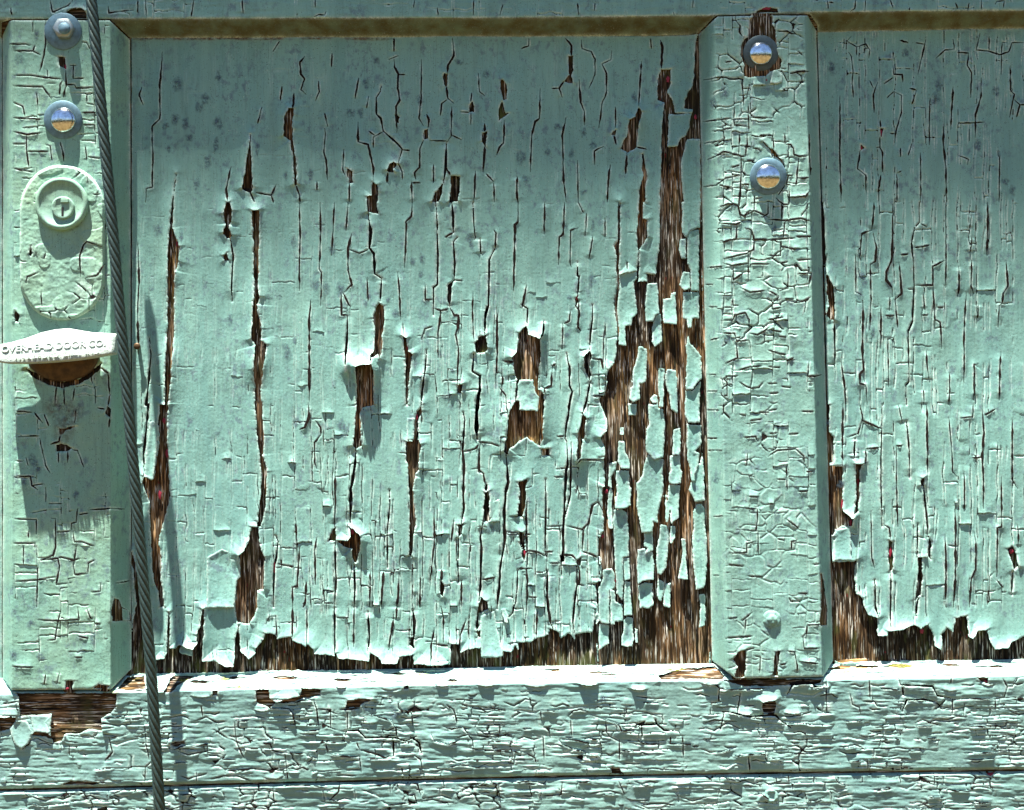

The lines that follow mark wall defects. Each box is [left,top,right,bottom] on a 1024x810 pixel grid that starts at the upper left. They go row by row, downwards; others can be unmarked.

crack [10,0,194,202]
peeling [741,7,777,46]
crack [16,224,106,322]
peeling [0,42,809,753]
crack [215,3,664,664]
crack [703,0,1024,624]
crack [13,367,128,684]
peeling [820,402,1024,687]
peeling [182,764,308,790]
peeling [431,759,489,793]
crack [0,593,1024,810]
peeling [893,700,974,738]